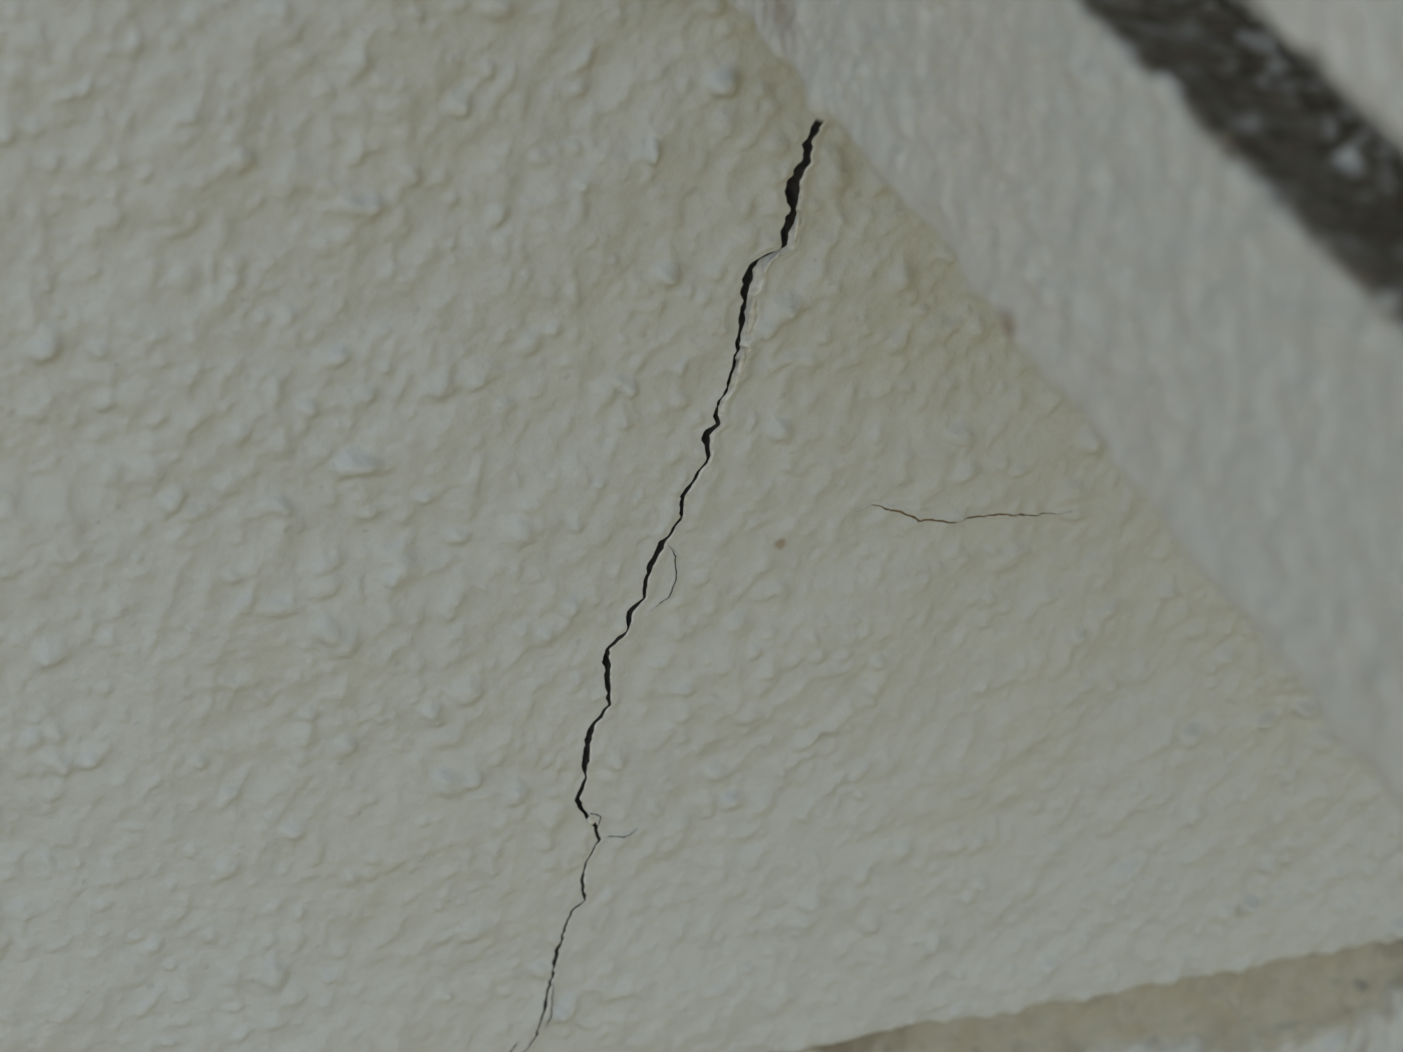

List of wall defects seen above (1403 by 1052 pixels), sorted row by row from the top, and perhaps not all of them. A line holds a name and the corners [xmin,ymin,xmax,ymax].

crack [506,119,826,1052]